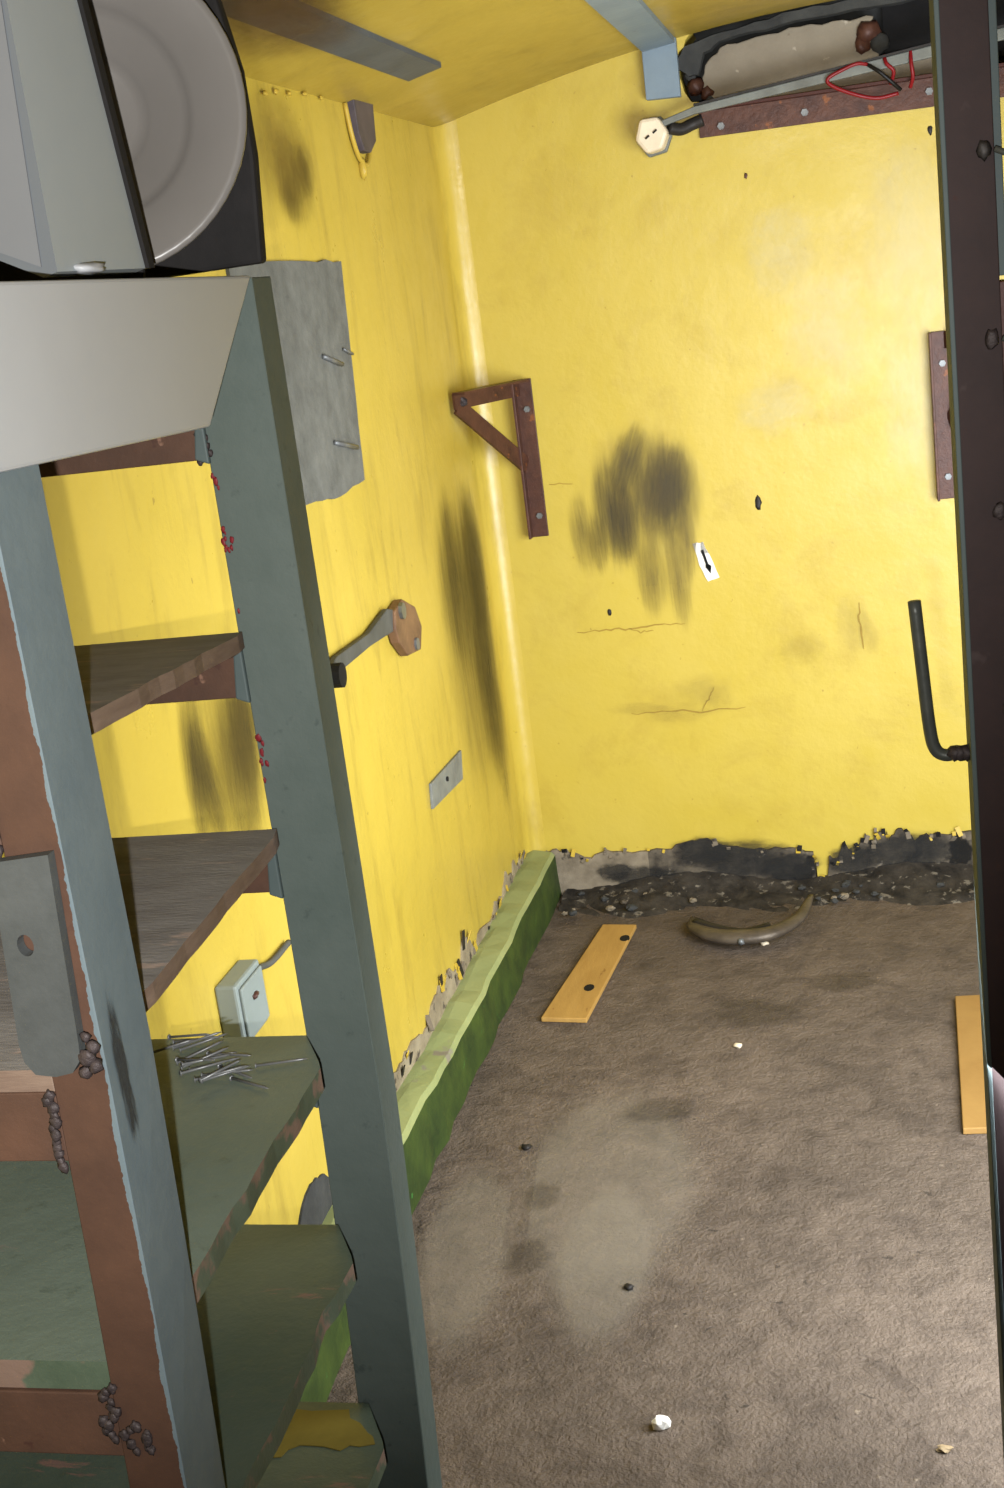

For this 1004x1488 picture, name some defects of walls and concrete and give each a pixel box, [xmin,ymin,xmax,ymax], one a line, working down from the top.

leakage [599,444,639,546]
leakage [446,529,501,738]
peeling [546,826,975,919]